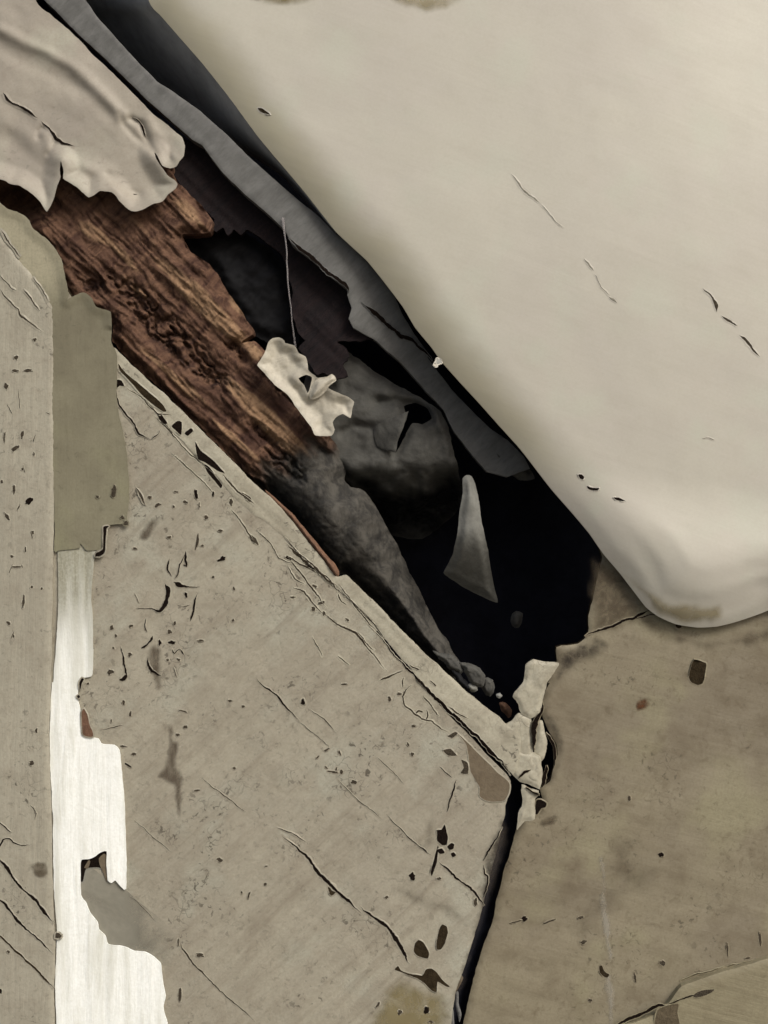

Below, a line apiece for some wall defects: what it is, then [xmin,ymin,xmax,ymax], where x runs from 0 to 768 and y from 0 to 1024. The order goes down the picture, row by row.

peeling [0,0,191,212]
crack [511,174,564,228]
crack [583,258,618,303]
crack [702,287,761,358]
peeling [0,203,260,558]
peeling [248,335,354,436]
spalling [284,297,600,830]
spalling [76,677,95,738]
damp [160,730,181,806]
spalling [81,851,151,953]
crack [276,826,411,965]
crack [616,960,752,1024]